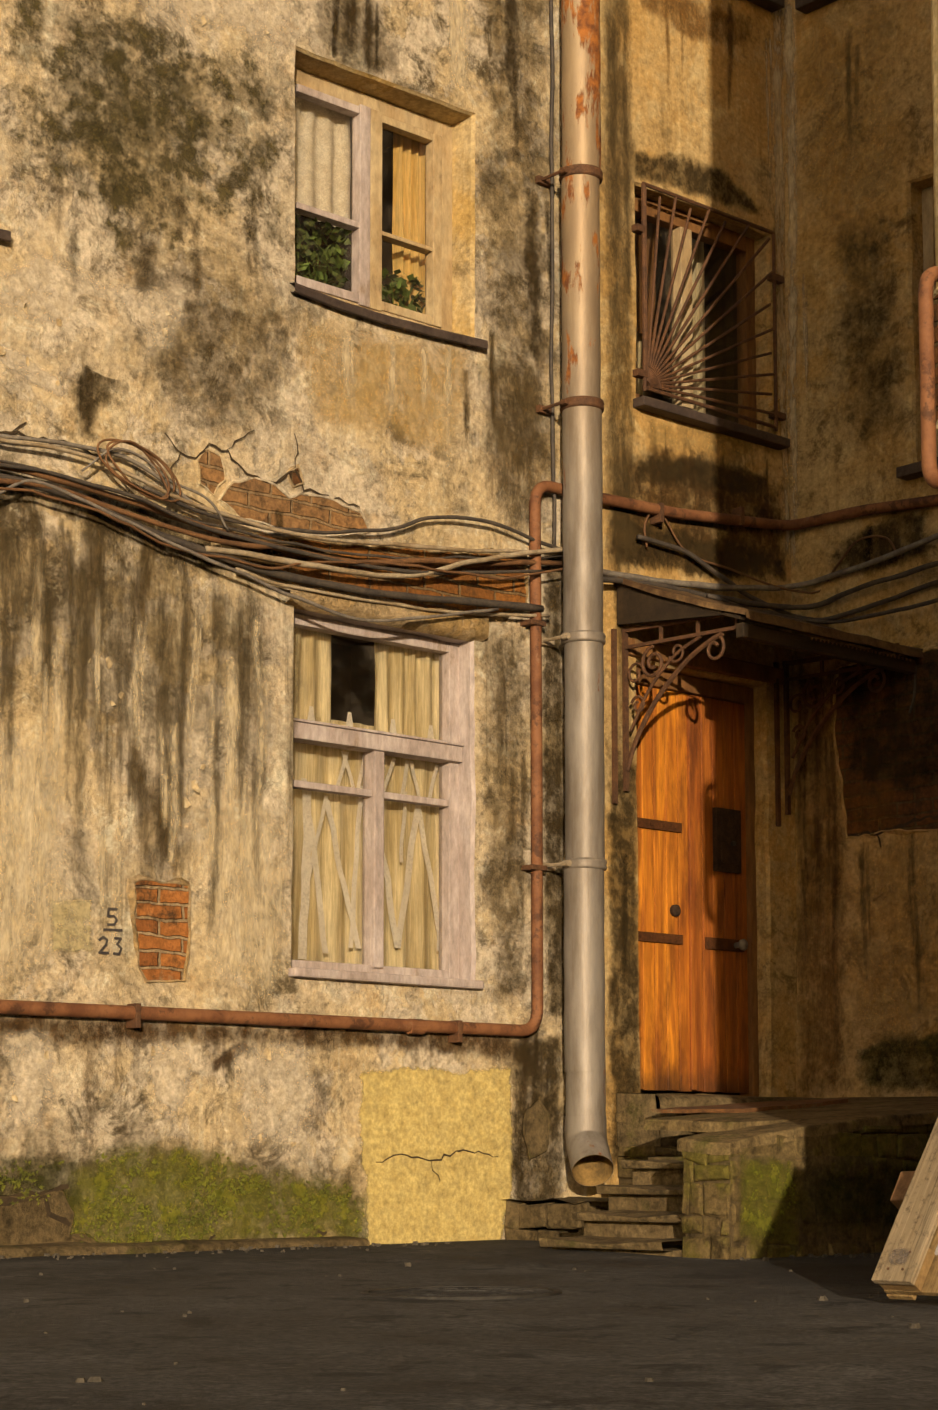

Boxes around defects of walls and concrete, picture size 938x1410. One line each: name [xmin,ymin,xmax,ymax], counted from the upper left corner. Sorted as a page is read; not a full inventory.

water stain [321,0,386,69]
water stain [6,0,280,273]
water stain [160,265,286,426]
water stain [318,338,469,440]
water stain [483,0,555,522]
water stain [606,0,808,595]
water stain [843,232,902,435]
spalling [195,448,529,623]
water stain [0,469,308,990]
spalling [126,874,191,983]
water stain [797,650,938,1091]
crack [376,1149,498,1181]